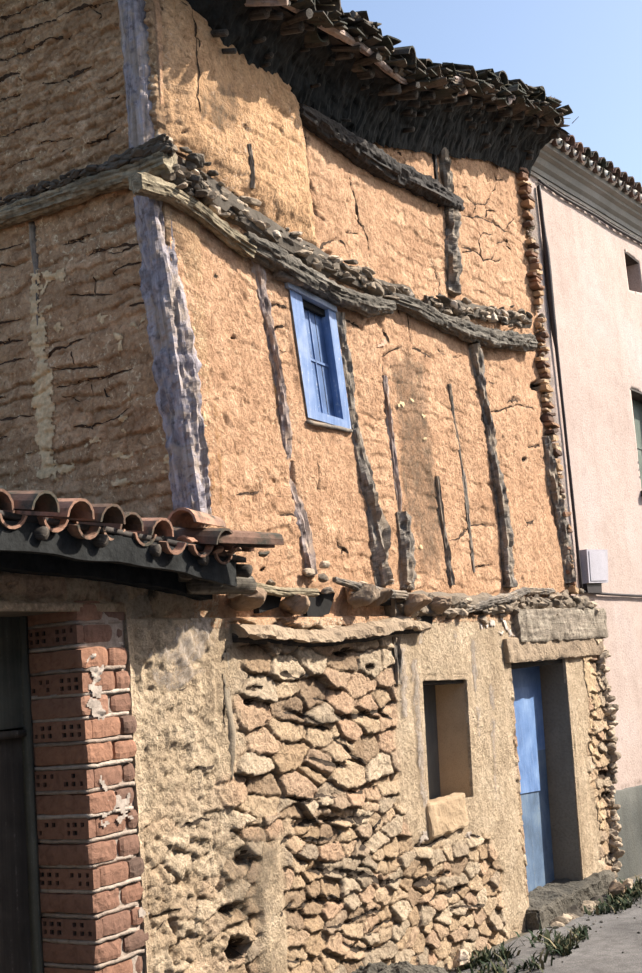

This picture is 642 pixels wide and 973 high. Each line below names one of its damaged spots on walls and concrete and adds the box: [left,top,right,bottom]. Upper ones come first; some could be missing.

crack [320,178,370,257]
crack [462,177,514,262]
crack [489,381,534,412]
spalling [243,685,263,707]
spalling [232,846,254,865]
spalling [224,937,245,963]